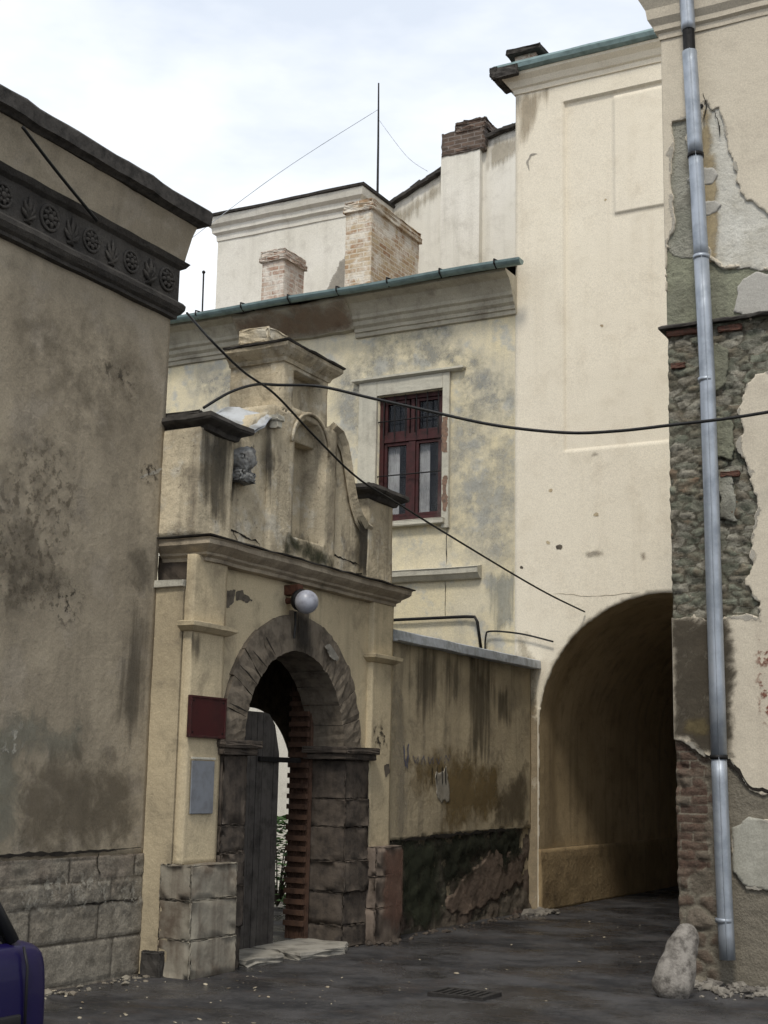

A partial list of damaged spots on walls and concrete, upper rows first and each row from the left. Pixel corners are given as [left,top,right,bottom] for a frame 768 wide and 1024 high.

flaking render [665,116,707,620]
flaking render [701,99,768,622]
water stain [202,433,235,515]
water stain [265,423,273,483]
water stain [359,522,368,573]
flaking render [226,589,252,608]
water stain [490,575,513,630]
water stain [126,639,139,722]
water stain [22,765,130,852]
water stain [416,643,538,909]
water stain [384,849,403,921]
flaking render [675,739,768,988]